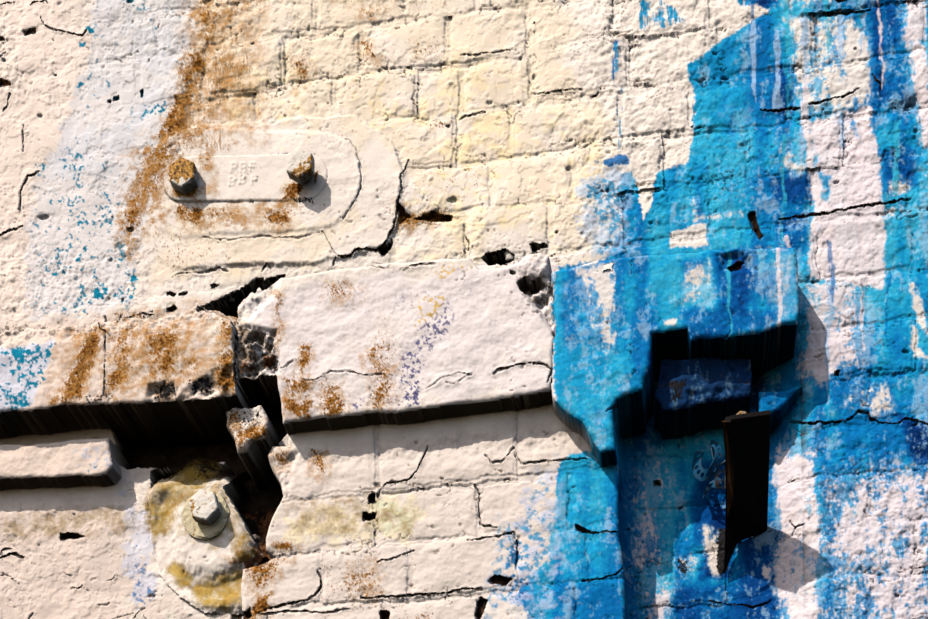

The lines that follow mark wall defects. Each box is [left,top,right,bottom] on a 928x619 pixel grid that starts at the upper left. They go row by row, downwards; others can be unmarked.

corrosion [120,0,250,283]
crack [0,171,37,235]
crack [201,162,436,270]
corrosion [50,311,240,405]
peeling [188,376,214,397]
spalling [240,328,278,374]
corrosion [282,341,346,421]
crack [791,410,928,425]
leakage [145,468,219,535]
leakage [168,514,251,612]
corrosion [223,507,293,619]
peeling [716,528,729,576]